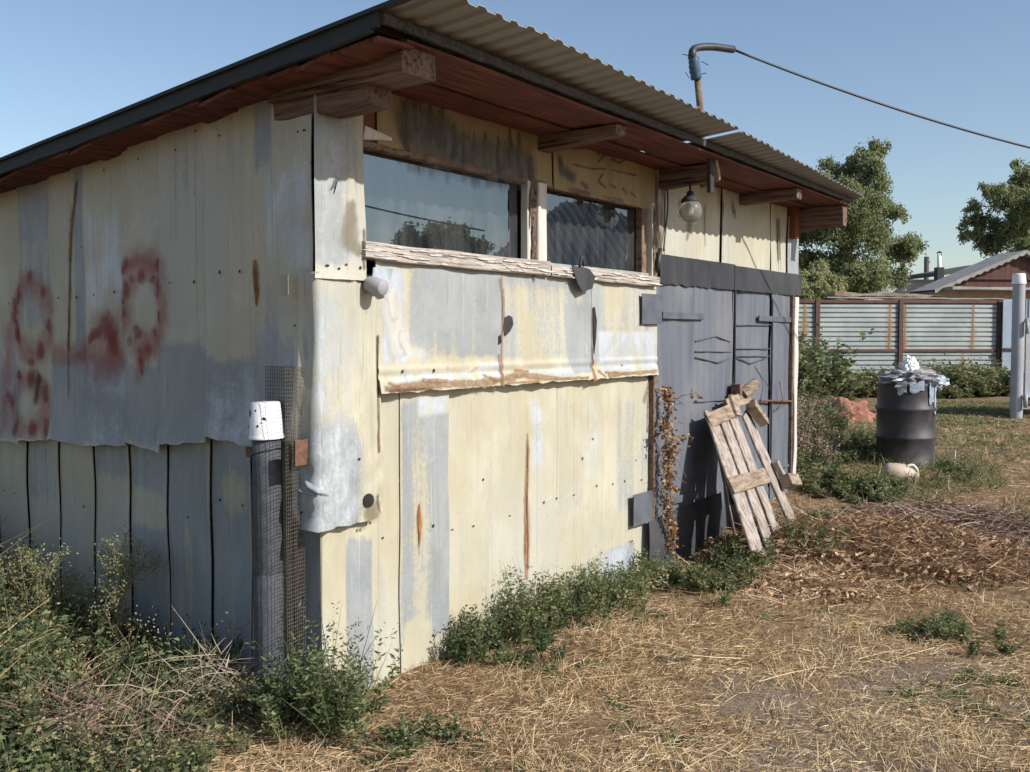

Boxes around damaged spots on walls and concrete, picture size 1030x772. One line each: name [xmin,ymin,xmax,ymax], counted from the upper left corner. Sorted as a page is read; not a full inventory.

water stain [397,99,535,185]
rust [378,278,657,452]
rust [367,495,381,521]